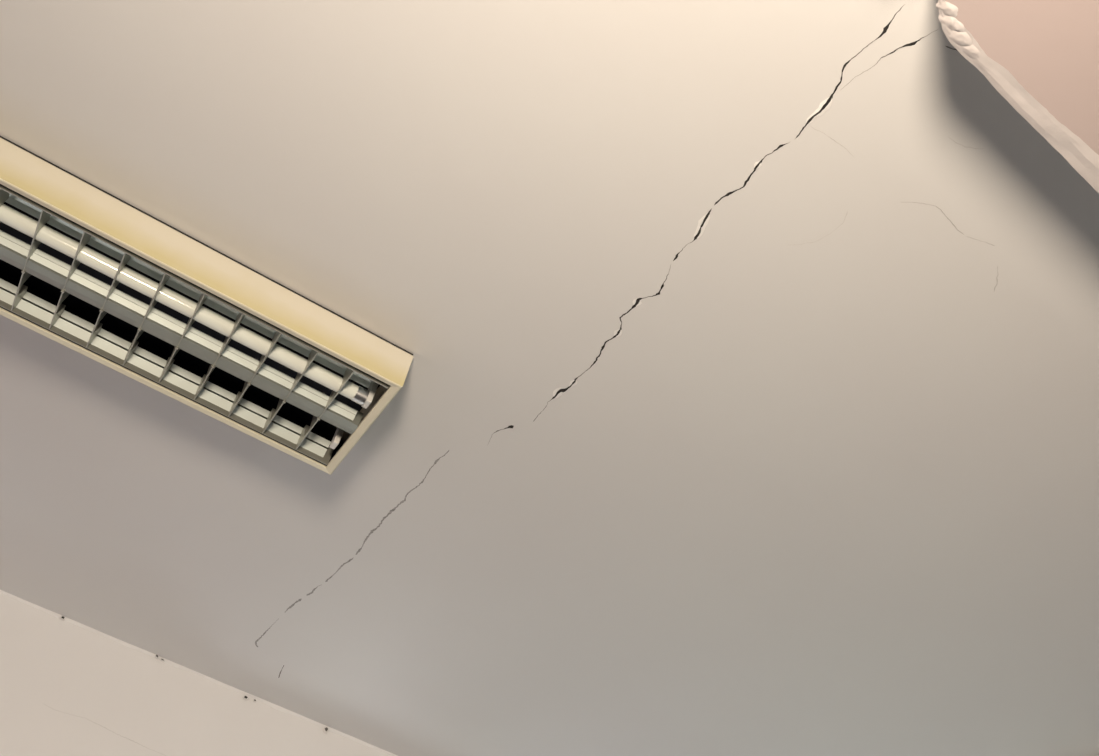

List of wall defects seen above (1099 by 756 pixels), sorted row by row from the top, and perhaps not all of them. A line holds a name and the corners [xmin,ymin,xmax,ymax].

crack [489,4,958,442]
crack [255,450,449,647]